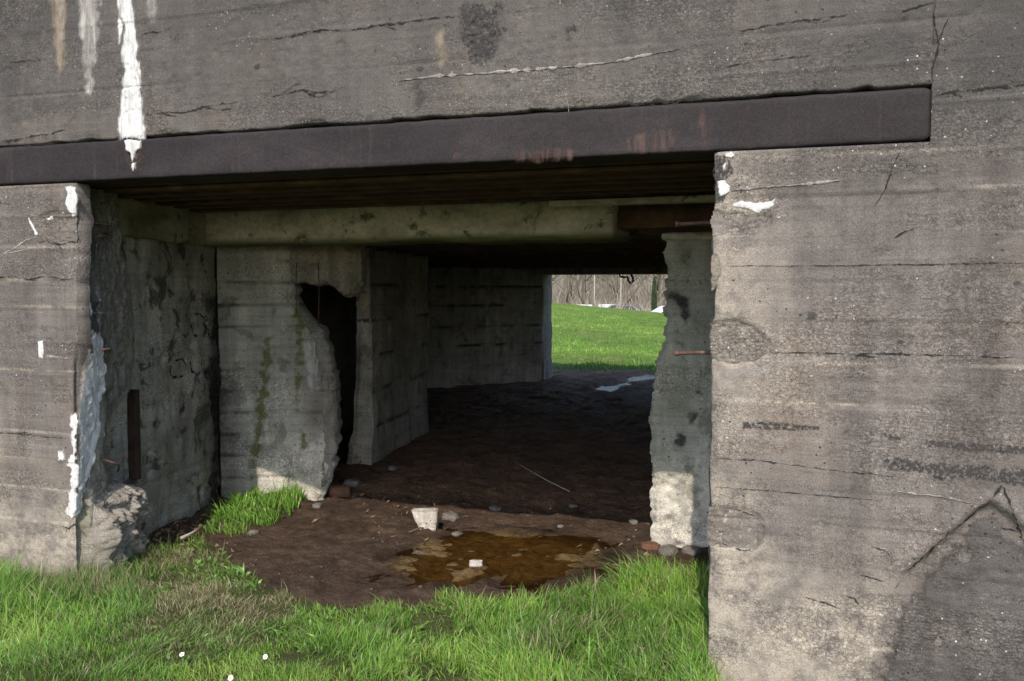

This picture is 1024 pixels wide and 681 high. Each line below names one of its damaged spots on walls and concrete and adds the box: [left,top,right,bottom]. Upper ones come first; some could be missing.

damp [55,0,66,68]
damp [80,0,96,93]
damp [117,0,145,171]
crack [273,83,340,97]
crack [902,1,1024,97]
spalling [675,152,780,237]
crack [874,149,902,206]
spalling [302,320,338,487]
crack [805,485,1024,610]